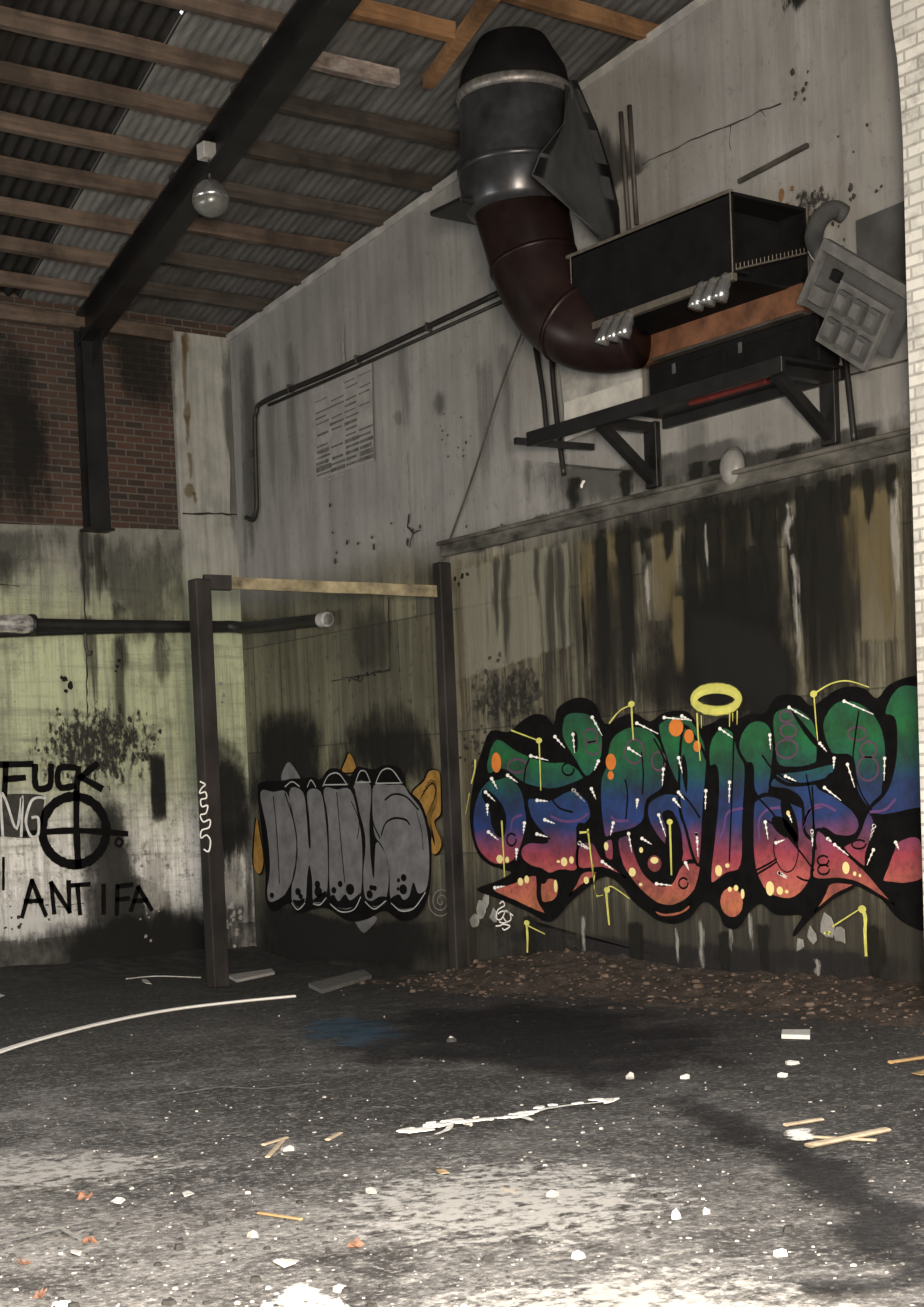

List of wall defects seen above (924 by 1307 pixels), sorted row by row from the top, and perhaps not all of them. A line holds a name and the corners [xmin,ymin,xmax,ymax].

water stain [79,532,107,598]
corrosion [580,531,617,620]
corrosion [657,531,683,665]
corrosion [843,485,893,623]
water stain [87,618,97,699]
water stain [115,638,124,725]